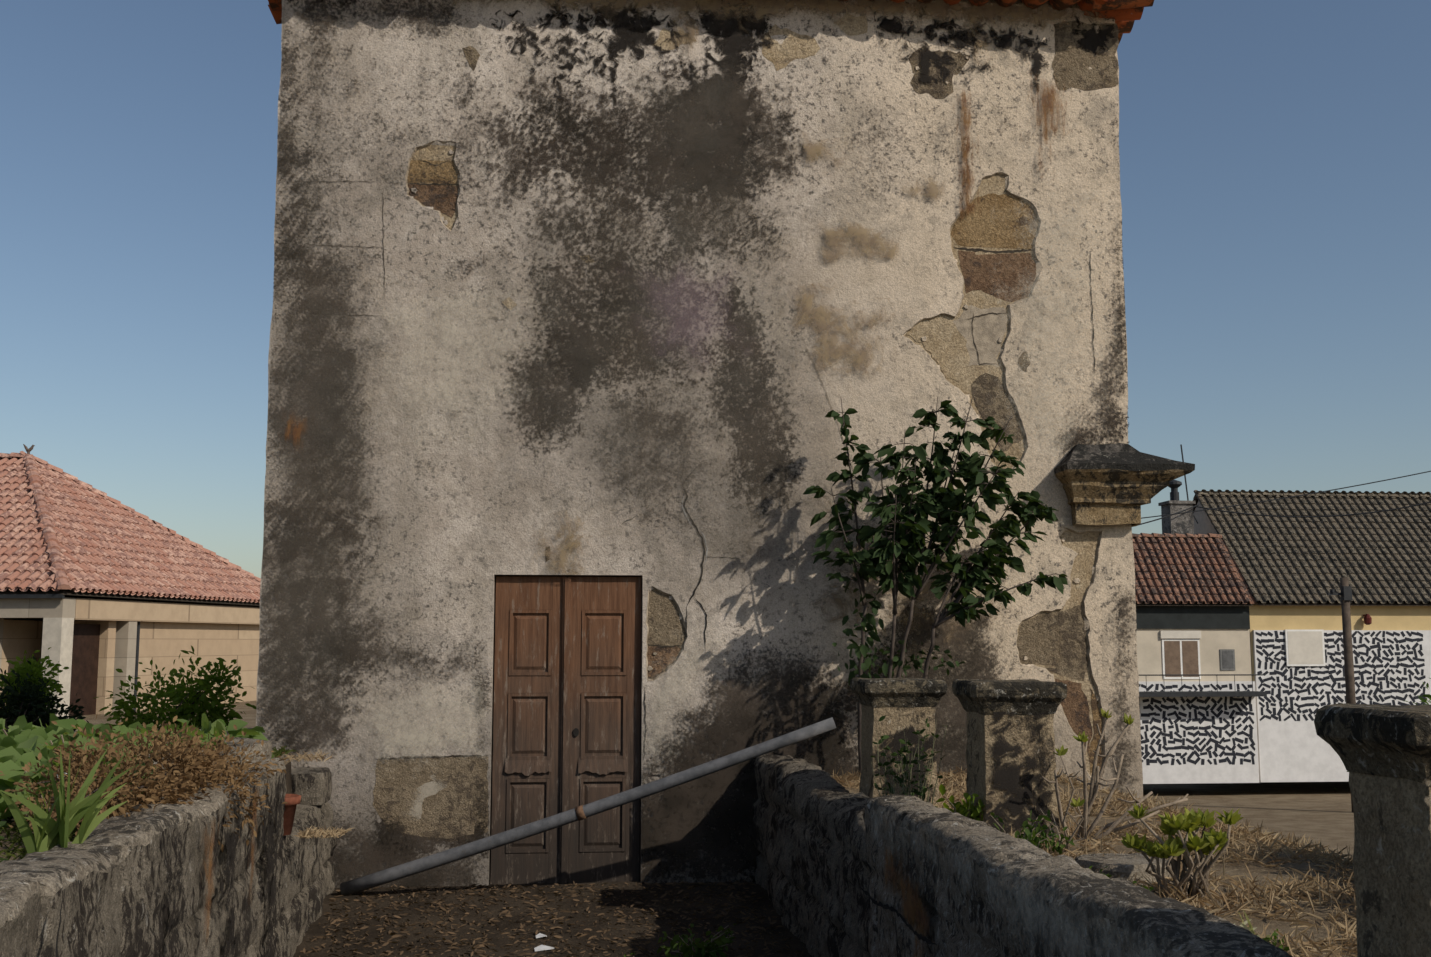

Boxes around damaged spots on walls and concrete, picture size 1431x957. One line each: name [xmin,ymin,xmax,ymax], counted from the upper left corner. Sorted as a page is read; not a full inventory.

spalling [1052,16,1119,91]
spalling [392,128,473,243]
spalling [891,161,1054,484]
spalling [642,573,700,694]
leakage [257,0,1099,957]
crack [682,465,738,654]
spalling [1004,515,1118,790]